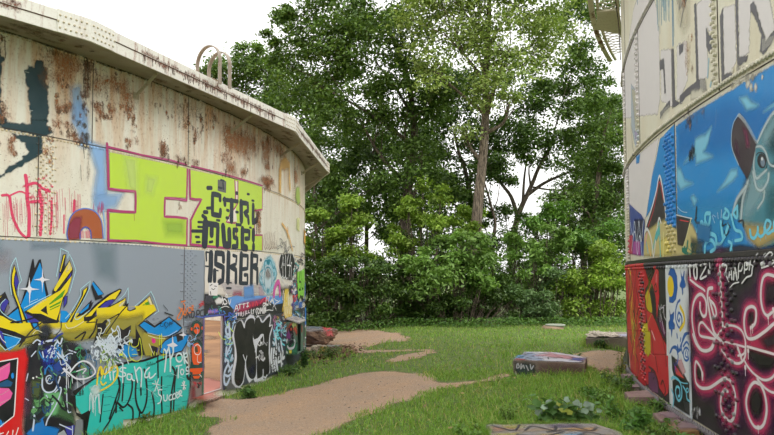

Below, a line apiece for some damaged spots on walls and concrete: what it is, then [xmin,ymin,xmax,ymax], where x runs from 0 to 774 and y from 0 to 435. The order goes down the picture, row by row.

rust [0,24,137,163]
rust [142,50,325,200]